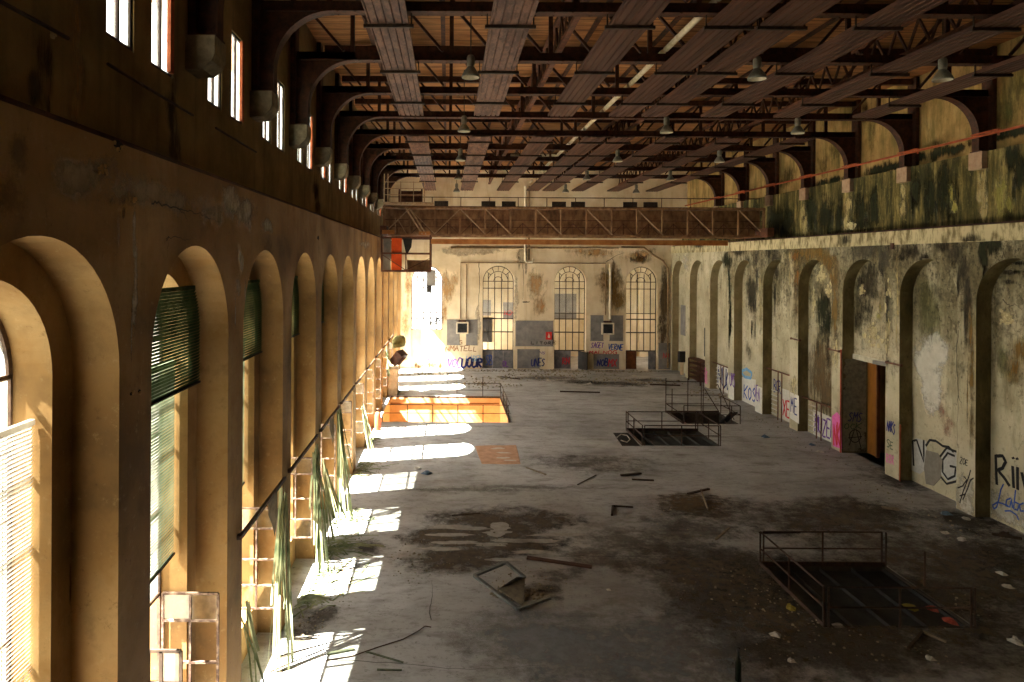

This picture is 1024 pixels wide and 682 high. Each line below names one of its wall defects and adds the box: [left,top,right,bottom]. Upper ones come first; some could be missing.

damp [935,185,958,222]
damp [977,168,1016,223]
damp [577,249,626,310]
damp [722,197,1004,452]